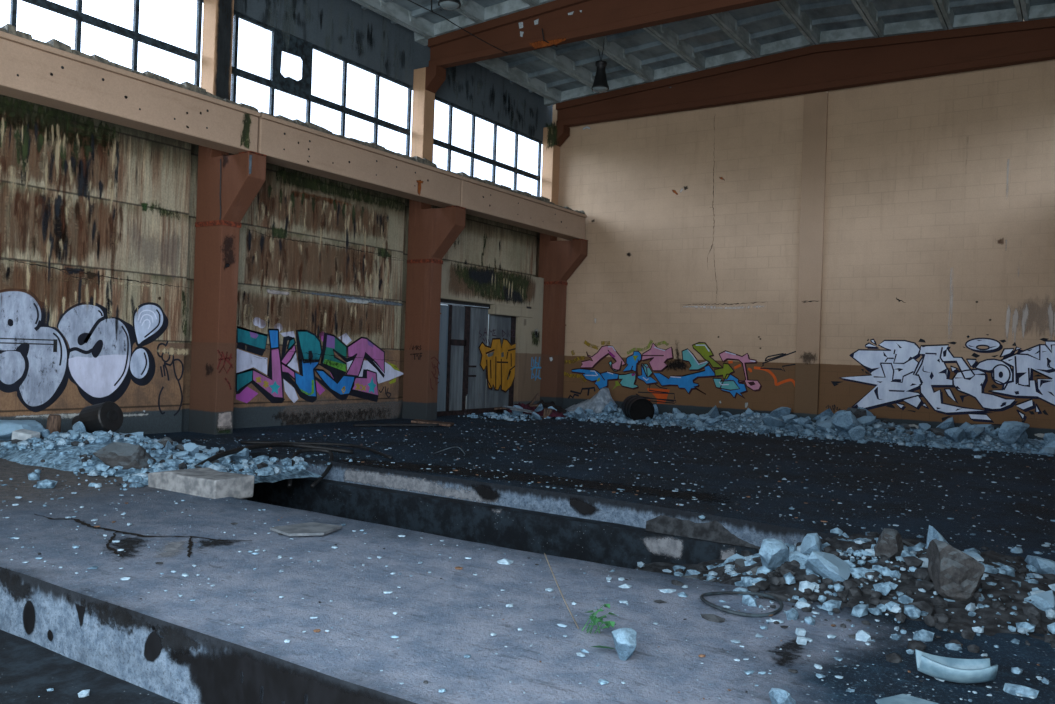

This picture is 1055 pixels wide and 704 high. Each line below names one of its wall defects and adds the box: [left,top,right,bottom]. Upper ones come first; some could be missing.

water stain [0,114,138,341]
water stain [237,189,392,341]
crack [683,117,764,305]